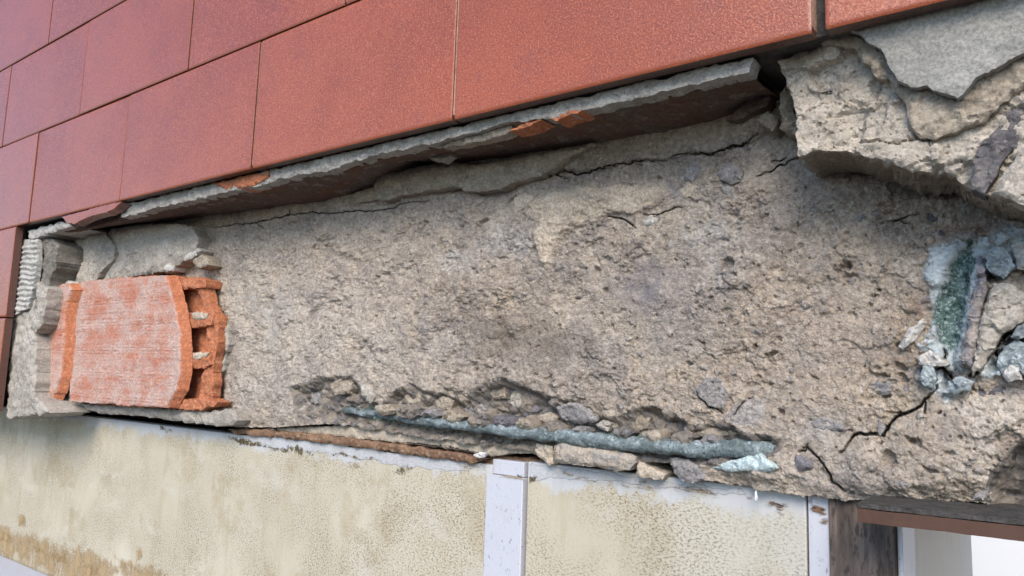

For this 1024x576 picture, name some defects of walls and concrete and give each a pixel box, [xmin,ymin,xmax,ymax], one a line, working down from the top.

peeling [439,125,518,151]
spalling [62,202,131,227]
peeling [513,182,664,265]
peeling [679,183,697,198]
leakage [916,225,1024,403]
spalling [917,242,1024,395]
rust [359,406,461,431]
spalling [287,376,786,465]
crack [802,332,1012,491]
spalling [986,441,1024,505]